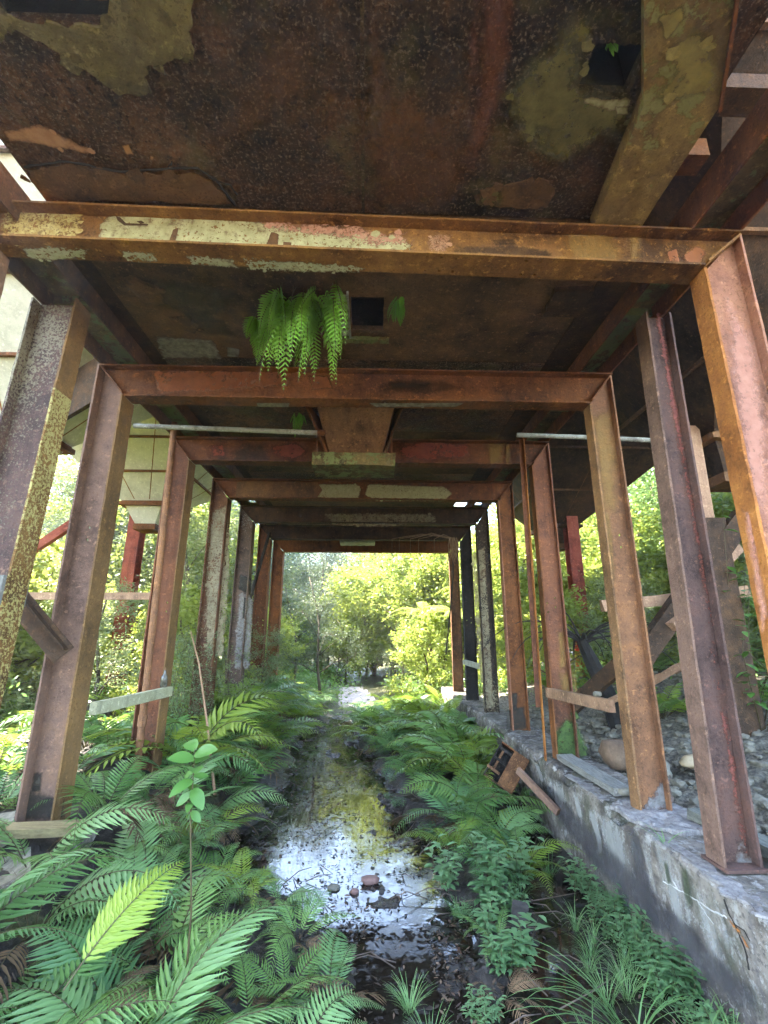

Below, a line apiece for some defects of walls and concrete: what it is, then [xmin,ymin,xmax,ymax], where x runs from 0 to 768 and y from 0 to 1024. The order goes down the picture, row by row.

corrosion [0,0,195,97]
peeling [579,39,595,77]
peeling [3,124,95,154]
corrosion [20,163,231,205]
corrosion [474,176,555,209]
peeling [0,212,88,262]
peeling [99,216,453,263]
peeling [186,255,366,274]
corrosion [729,309,765,504]
corrosion [747,513,765,619]
crack [663,877,750,970]